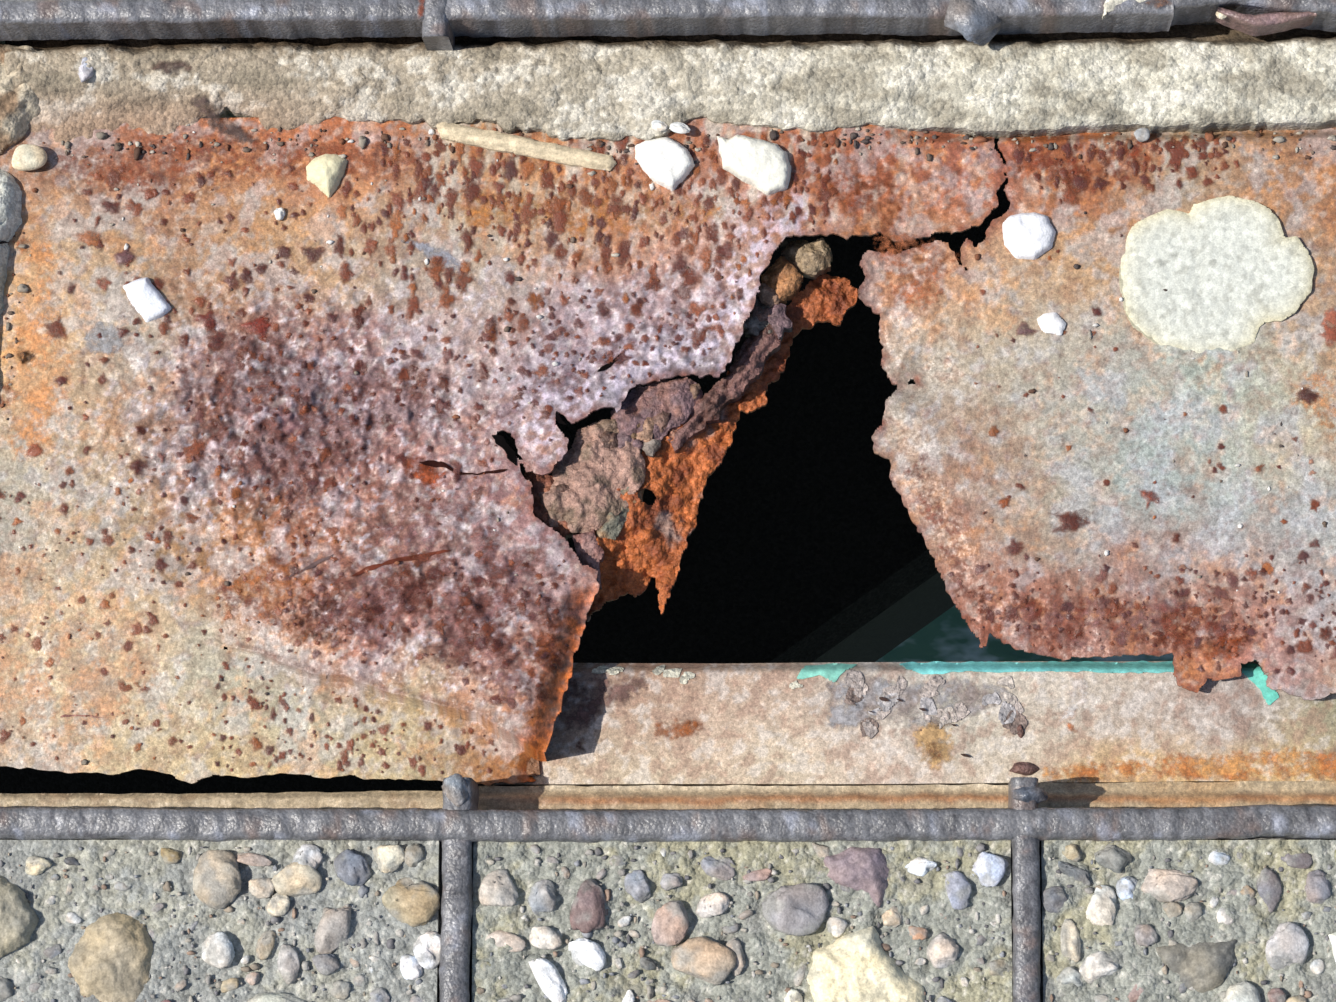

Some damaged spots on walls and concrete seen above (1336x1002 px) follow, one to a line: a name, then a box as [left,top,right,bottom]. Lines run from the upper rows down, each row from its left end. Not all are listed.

corrosion [1012,135,1239,205]
corrosion [881,230,953,304]
corrosion [995,322,1036,343]
corrosion [1320,308,1336,345]
corrosion [1297,374,1336,428]
corrosion [0,133,895,777]
corrosion [982,483,1024,523]
corrosion [1053,512,1089,532]
corrosion [1141,480,1158,519]
corrosion [940,539,1336,676]
corrosion [915,720,952,768]
corrosion [1009,748,1336,781]